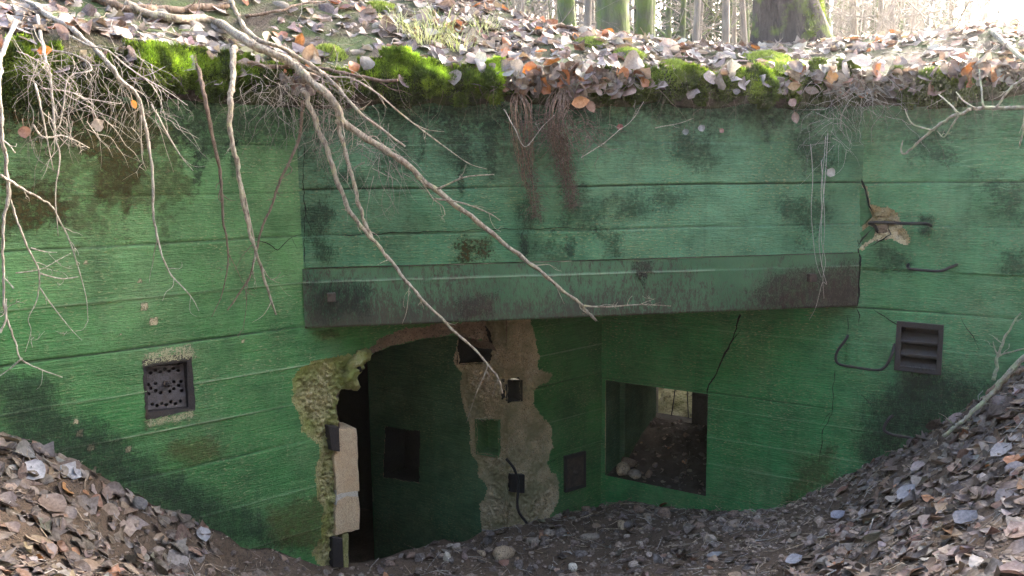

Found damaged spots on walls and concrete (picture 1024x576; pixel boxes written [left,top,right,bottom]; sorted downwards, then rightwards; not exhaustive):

spalling [291,319,559,566]
crack [707,314,741,392]